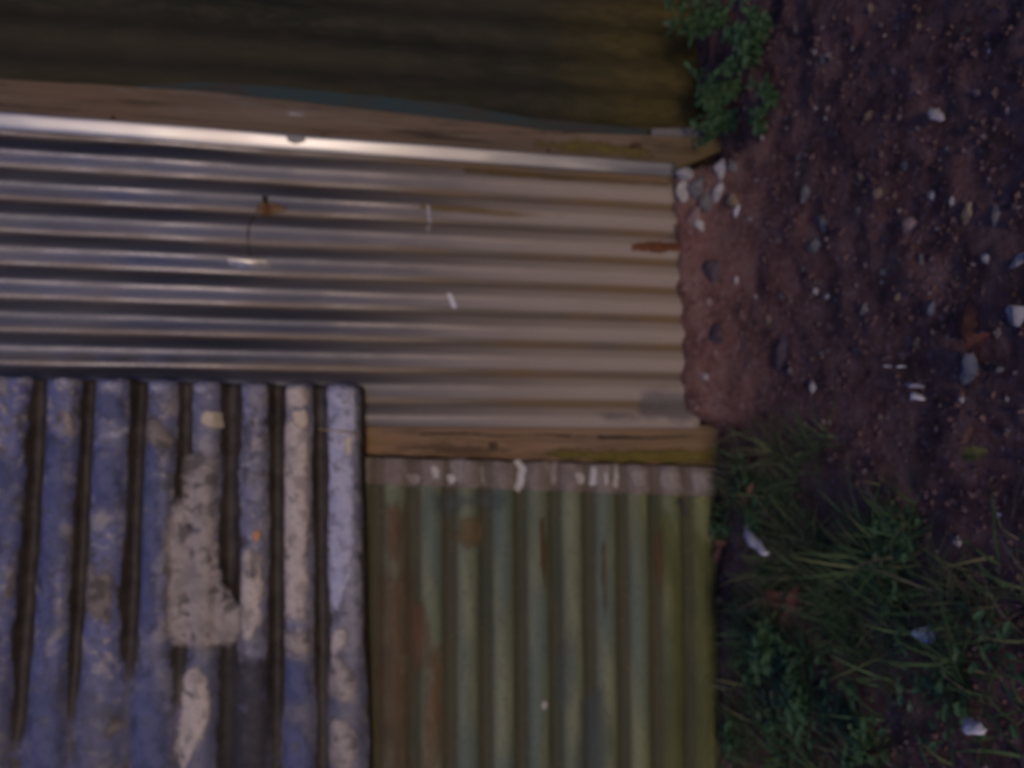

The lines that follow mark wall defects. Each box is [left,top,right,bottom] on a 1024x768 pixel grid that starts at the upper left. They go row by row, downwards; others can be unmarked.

rust [632,241,682,253]
peeling [163,452,264,650]
peeling [174,669,212,768]